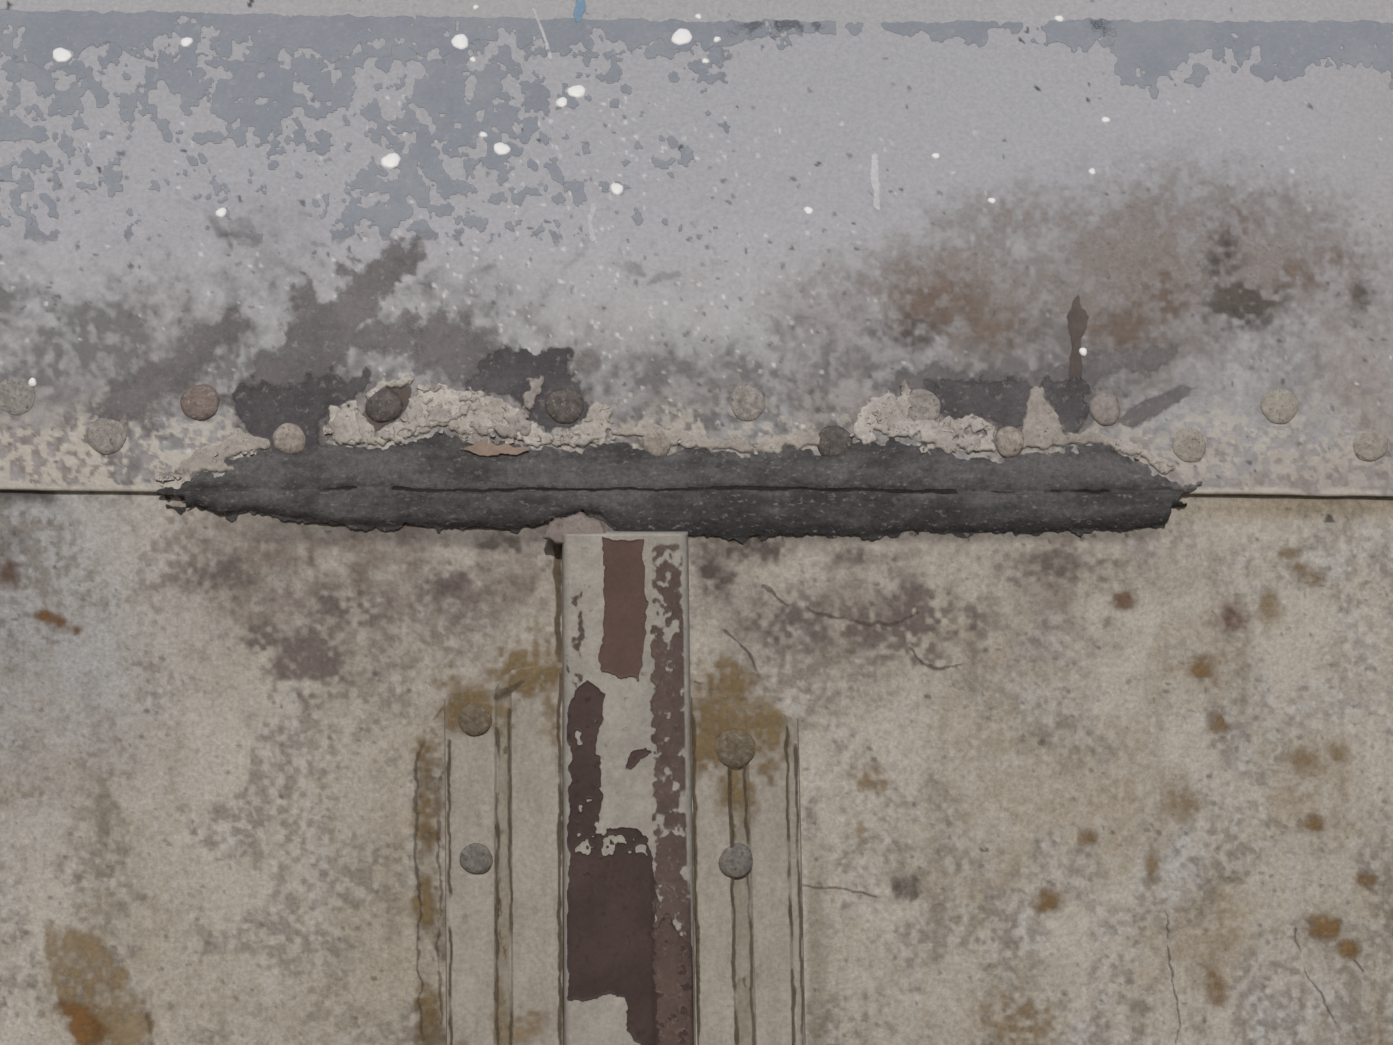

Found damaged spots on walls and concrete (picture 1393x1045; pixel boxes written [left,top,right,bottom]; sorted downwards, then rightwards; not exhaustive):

peeling [881,18,1393,99]
spalling [0,9,1202,544]
peeling [566,536,694,1045]
rust [412,878,436,923]
rust [46,930,154,1045]